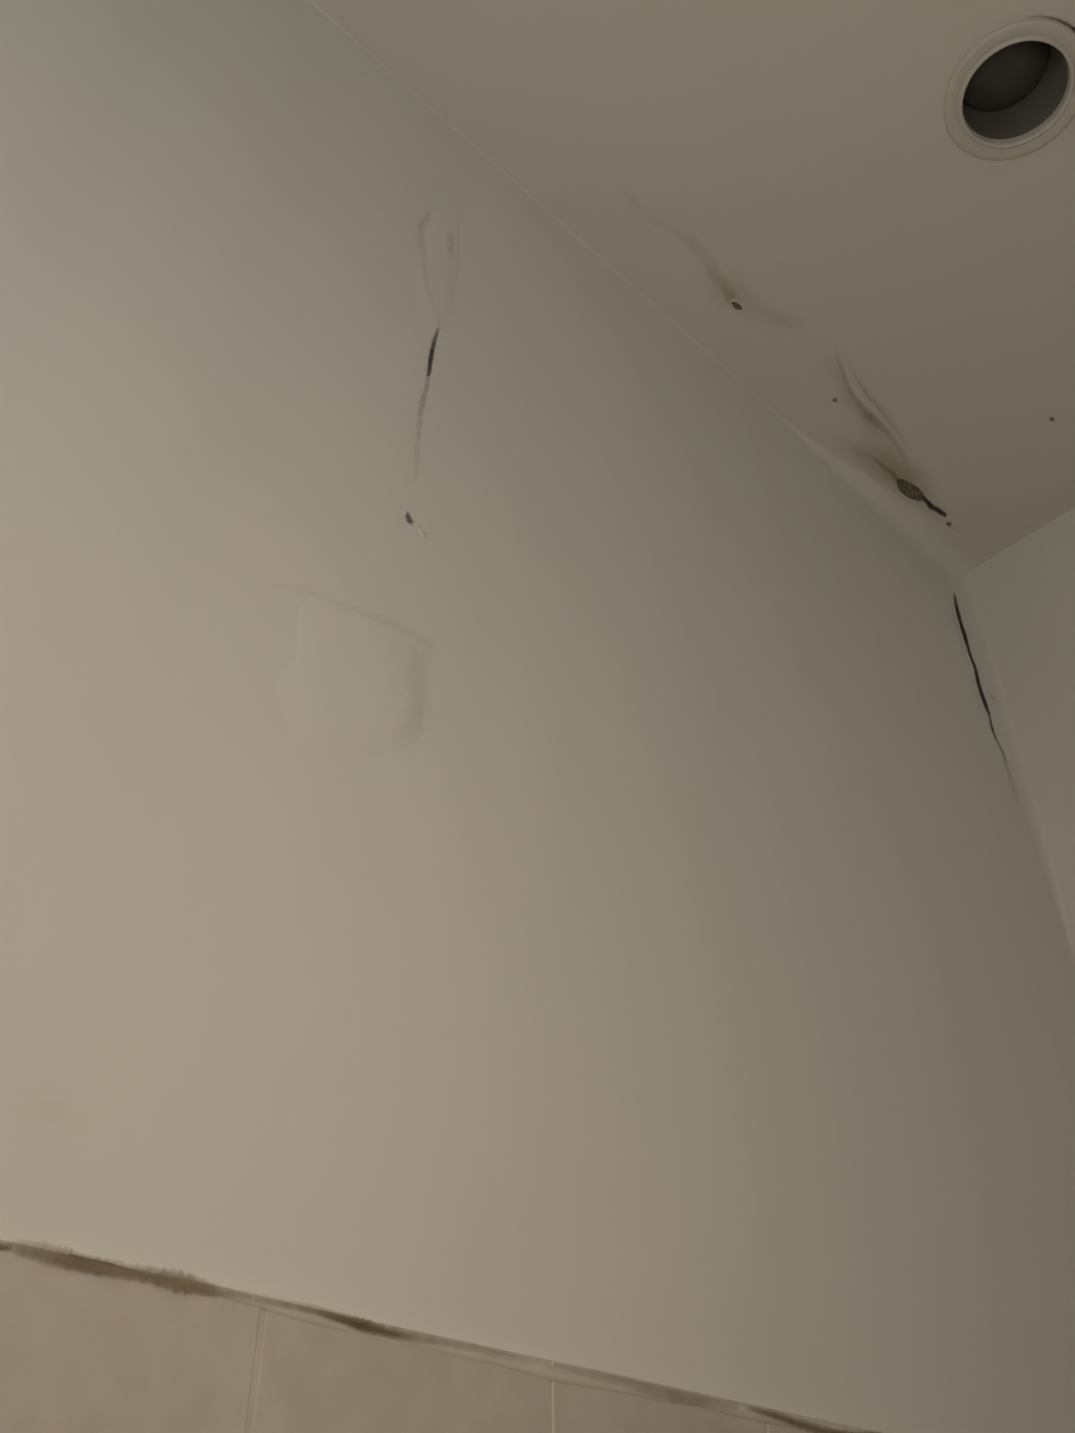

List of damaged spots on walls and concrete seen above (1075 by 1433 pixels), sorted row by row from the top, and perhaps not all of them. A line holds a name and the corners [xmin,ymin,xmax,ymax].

crack [428,337,436,375]
crack [897,479,950,525]
crack [950,593,1000,745]